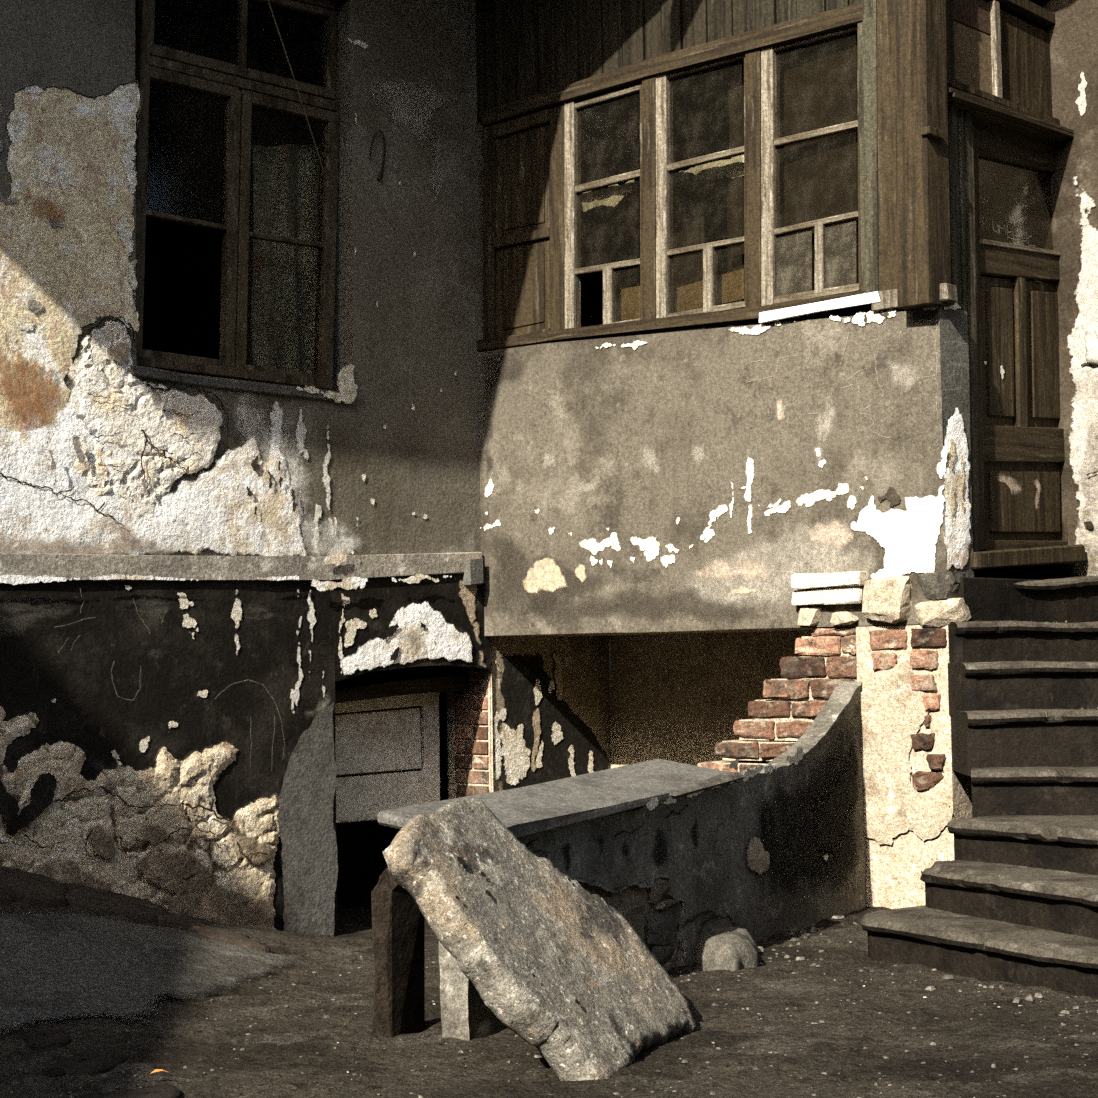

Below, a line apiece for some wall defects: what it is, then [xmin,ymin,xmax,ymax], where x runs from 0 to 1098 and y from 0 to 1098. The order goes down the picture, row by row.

corrosion [1,343,58,427]
crack [80,316,136,343]
peeling [0,79,312,556]
crack [86,383,229,492]
flaking render [296,364,358,404]
peeling [1067,176,1098,577]
crack [0,472,124,526]
peeling [569,505,728,568]
flaking render [758,408,971,626]
peeling [311,576,472,675]
flaking render [0,705,280,929]
damp [760,734,858,886]